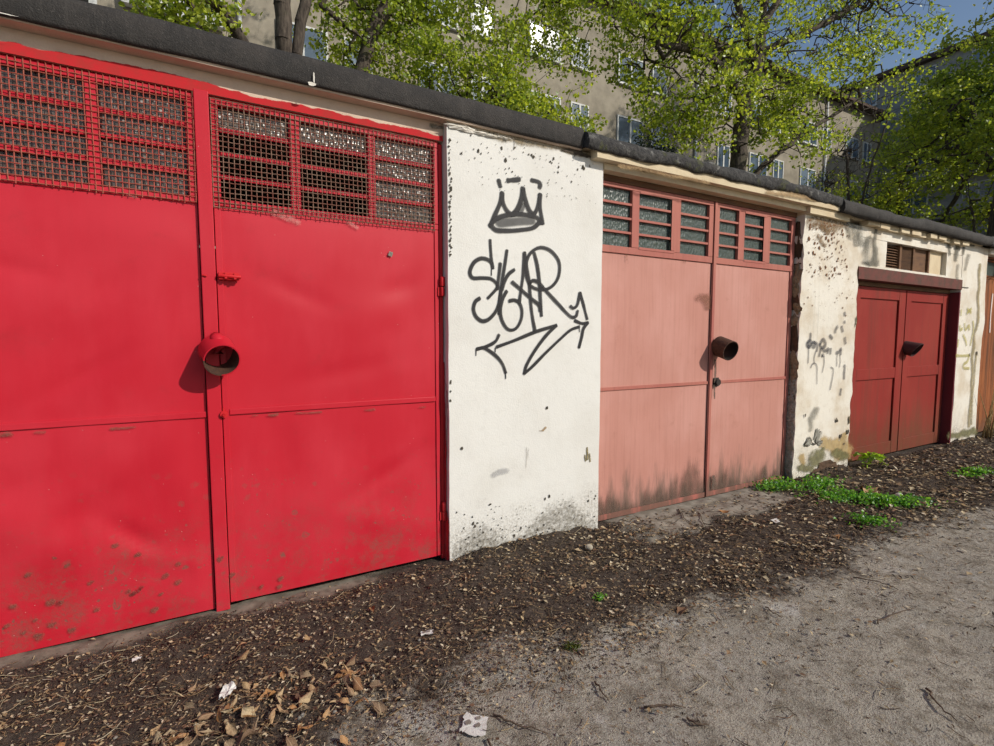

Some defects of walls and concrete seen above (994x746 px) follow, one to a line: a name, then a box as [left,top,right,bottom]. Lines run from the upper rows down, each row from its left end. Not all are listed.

spalling [784,221,803,479]
peeling [805,428,823,447]
flaking render [812,460,844,474]